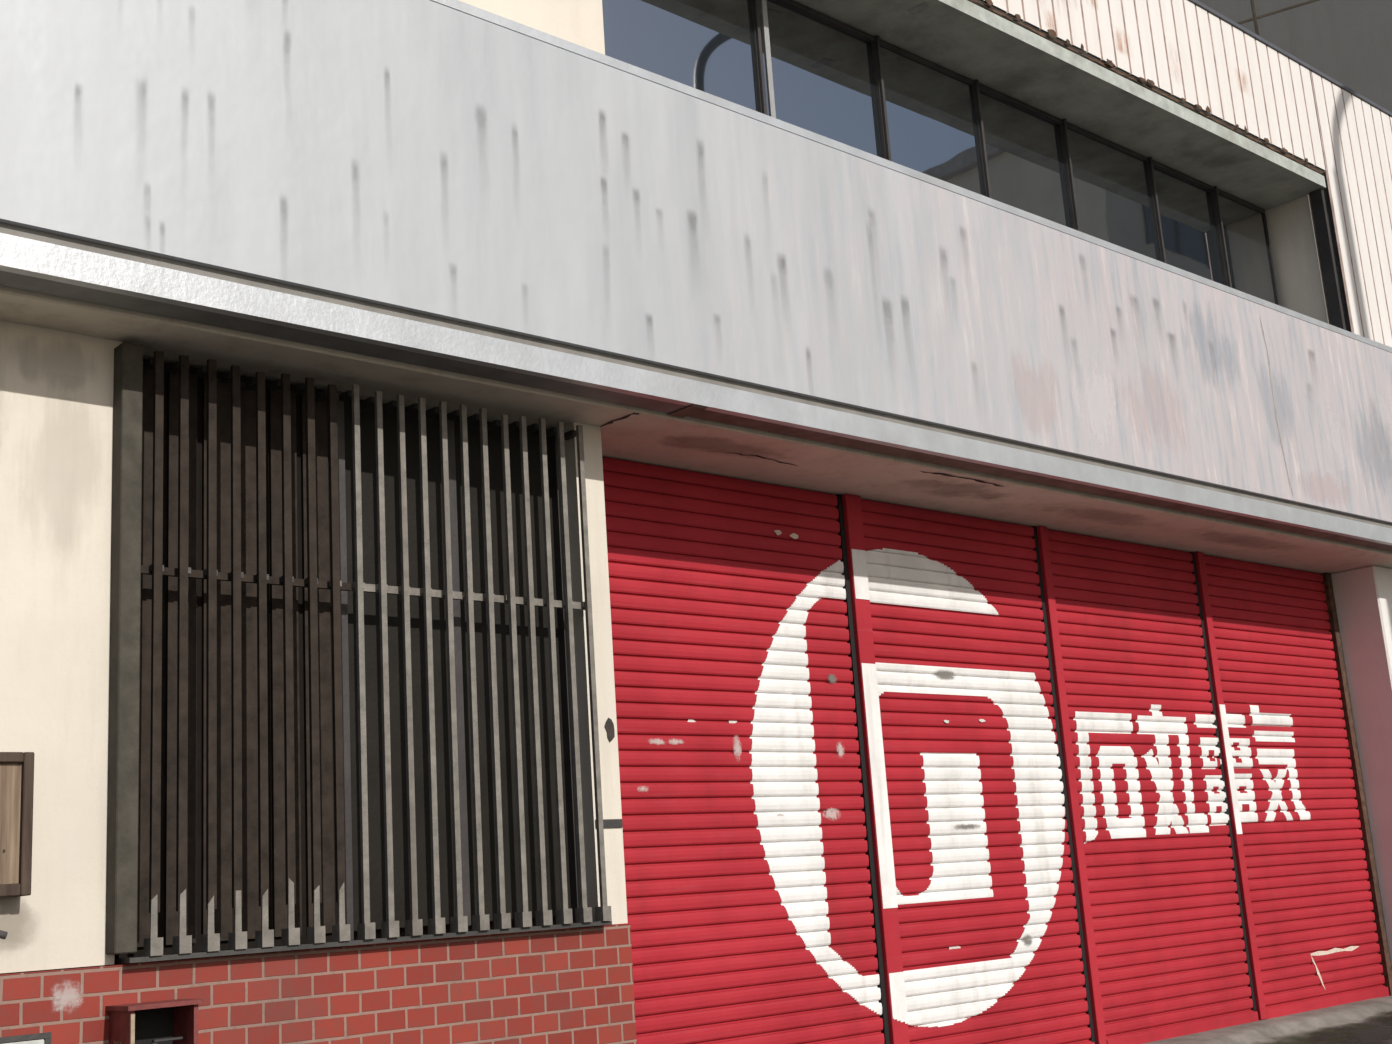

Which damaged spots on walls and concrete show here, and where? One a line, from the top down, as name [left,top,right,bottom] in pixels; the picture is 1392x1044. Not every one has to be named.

crack [600,413,639,427]
crack [733,453,796,466]